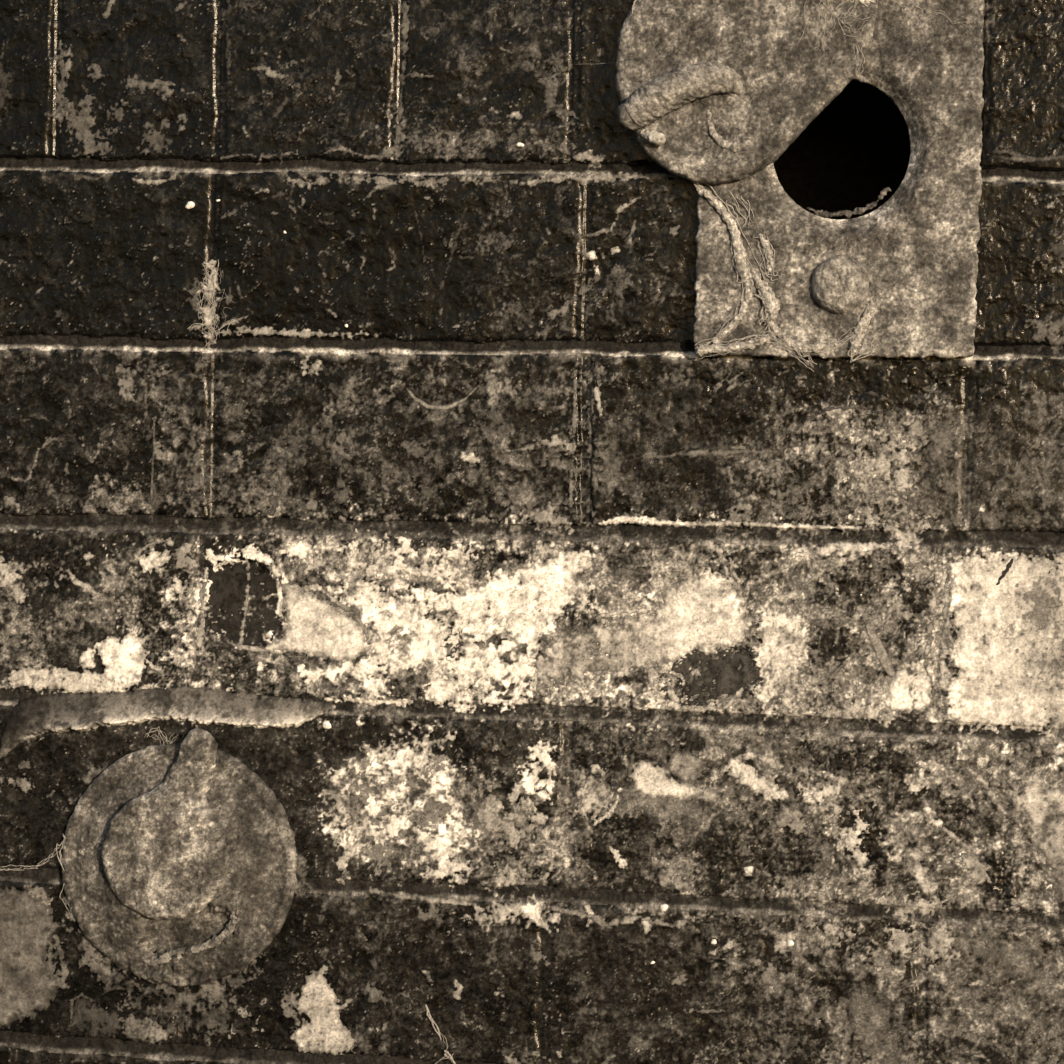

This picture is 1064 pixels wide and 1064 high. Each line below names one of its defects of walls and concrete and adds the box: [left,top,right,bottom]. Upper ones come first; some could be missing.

peeling [115,363,172,420]
peeling [293,353,323,381]
peeling [3,397,72,513]
peeling [54,406,816,721]
peeling [643,386,1064,740]
peeling [8,633,163,695]
peeling [313,718,559,895]
peeling [571,750,961,992]
peeling [907,767,992,885]
peeling [967,767,1064,909]
peeling [278,965,357,1056]
peeling [453,979,464,1000]